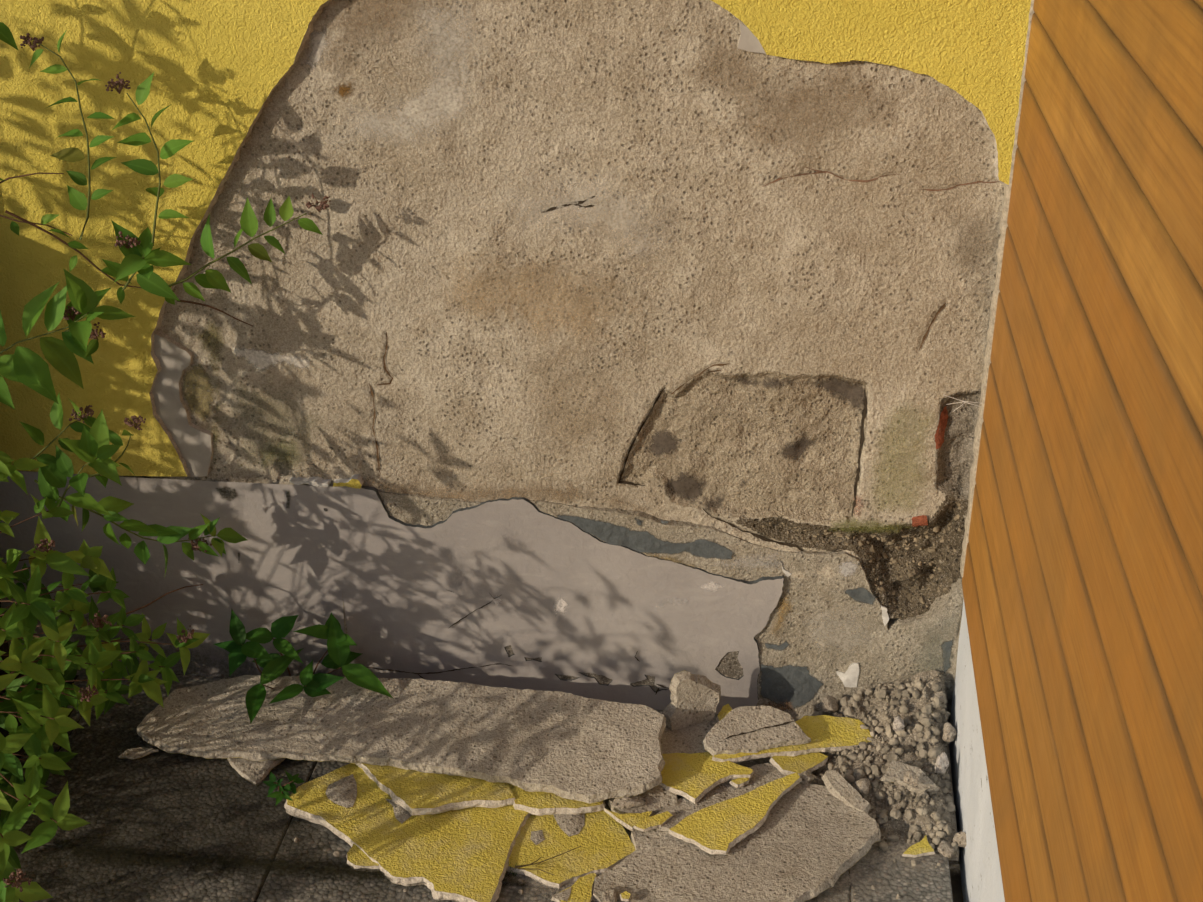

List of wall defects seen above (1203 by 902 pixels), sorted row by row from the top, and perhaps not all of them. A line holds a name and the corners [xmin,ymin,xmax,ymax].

crack [762,167,896,187]
crack [921,181,998,191]
crack [369,332,393,474]
peeling [149,0,1006,723]
crack [618,363,729,486]
crack [852,388,867,516]
crack [703,508,847,555]